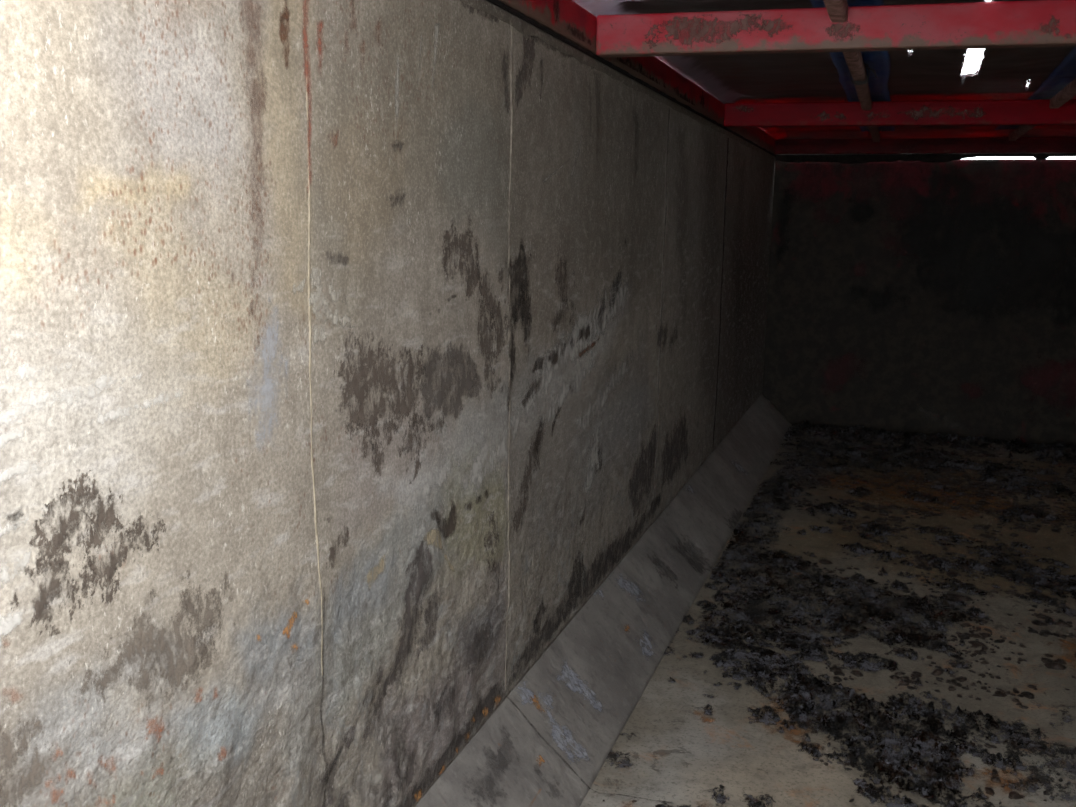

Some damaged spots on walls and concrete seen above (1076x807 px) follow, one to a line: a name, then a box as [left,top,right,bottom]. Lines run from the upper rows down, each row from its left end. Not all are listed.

peeling [644,13,792,49]
water stain [334,219,593,532]
water stain [629,417,688,517]